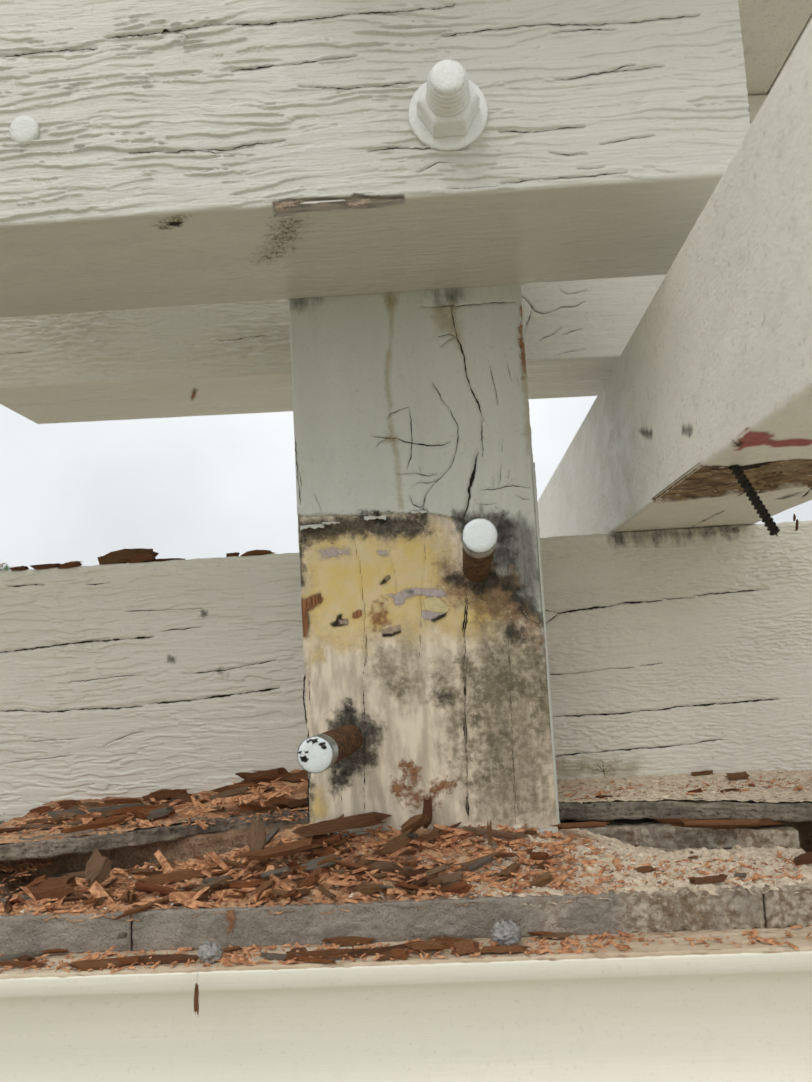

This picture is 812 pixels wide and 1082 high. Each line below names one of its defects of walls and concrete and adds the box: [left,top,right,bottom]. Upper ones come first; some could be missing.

crack [3,3,456,57]
crack [369,126,654,189]
crack [374,308,529,517]
peeling [733,428,812,451]
spalling [652,459,812,501]
crack [0,608,200,653]
water stain [298,511,545,821]
peeling [298,462,560,832]
crack [524,589,762,622]
crack [5,660,312,746]
crack [553,699,774,717]
corrosion [391,761,456,808]